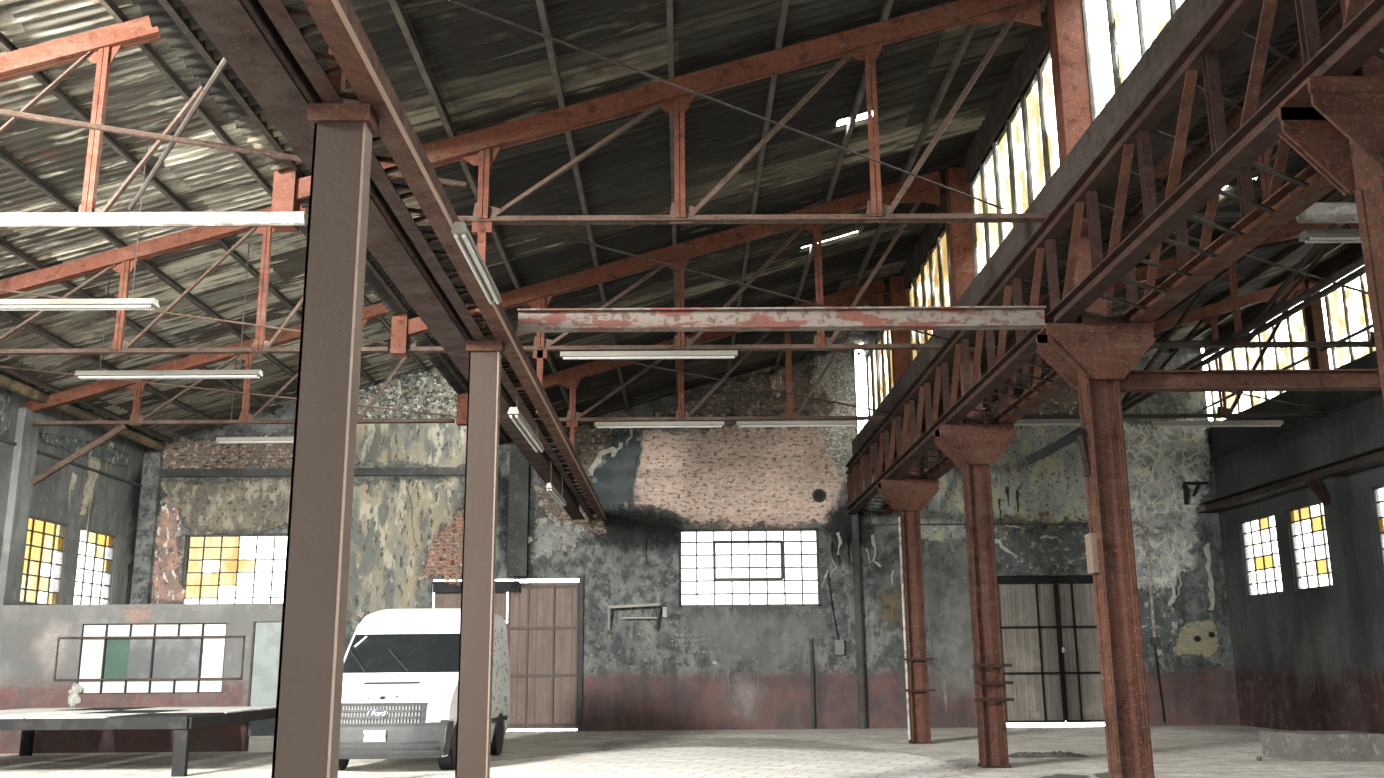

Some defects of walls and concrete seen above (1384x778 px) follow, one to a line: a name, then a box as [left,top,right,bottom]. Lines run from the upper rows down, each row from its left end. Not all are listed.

flaking render [150,431,294,604]
peeling [346,367,467,619]
flaking render [528,350,861,585]
leakage [923,563,973,707]
leakage [998,486,1019,526]
flaking render [1123,418,1221,659]